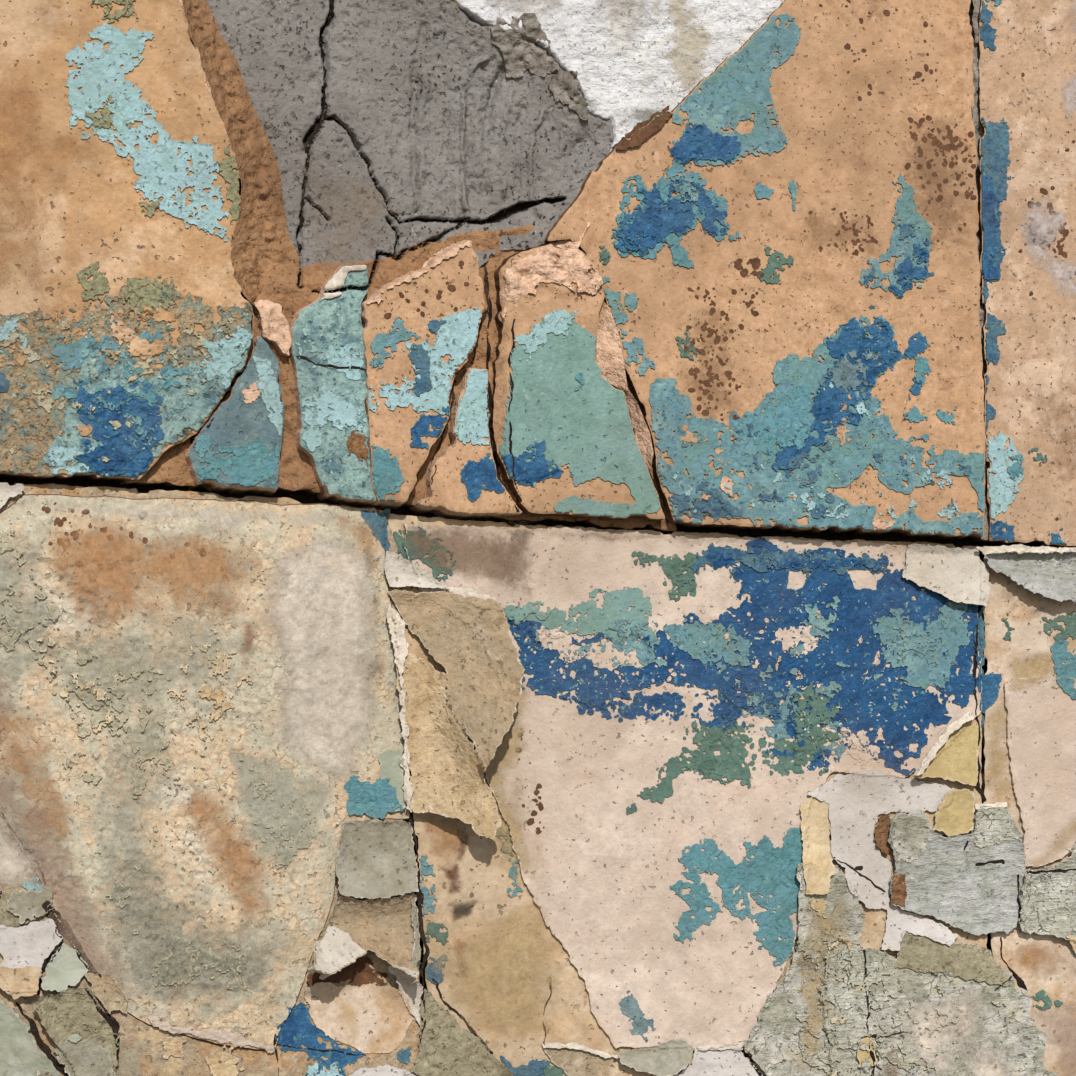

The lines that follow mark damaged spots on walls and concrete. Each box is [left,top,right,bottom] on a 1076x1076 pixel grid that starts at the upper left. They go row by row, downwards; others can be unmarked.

spalling [0,0,801,508]
crack [296,0,566,293]
peeling [819,114,1012,364]
spalling [900,40,937,82]
spalling [42,502,148,578]
peeling [0,529,253,799]
peeling [148,277,1076,1076]
crack [973,624,986,802]
crack [409,812,493,1054]